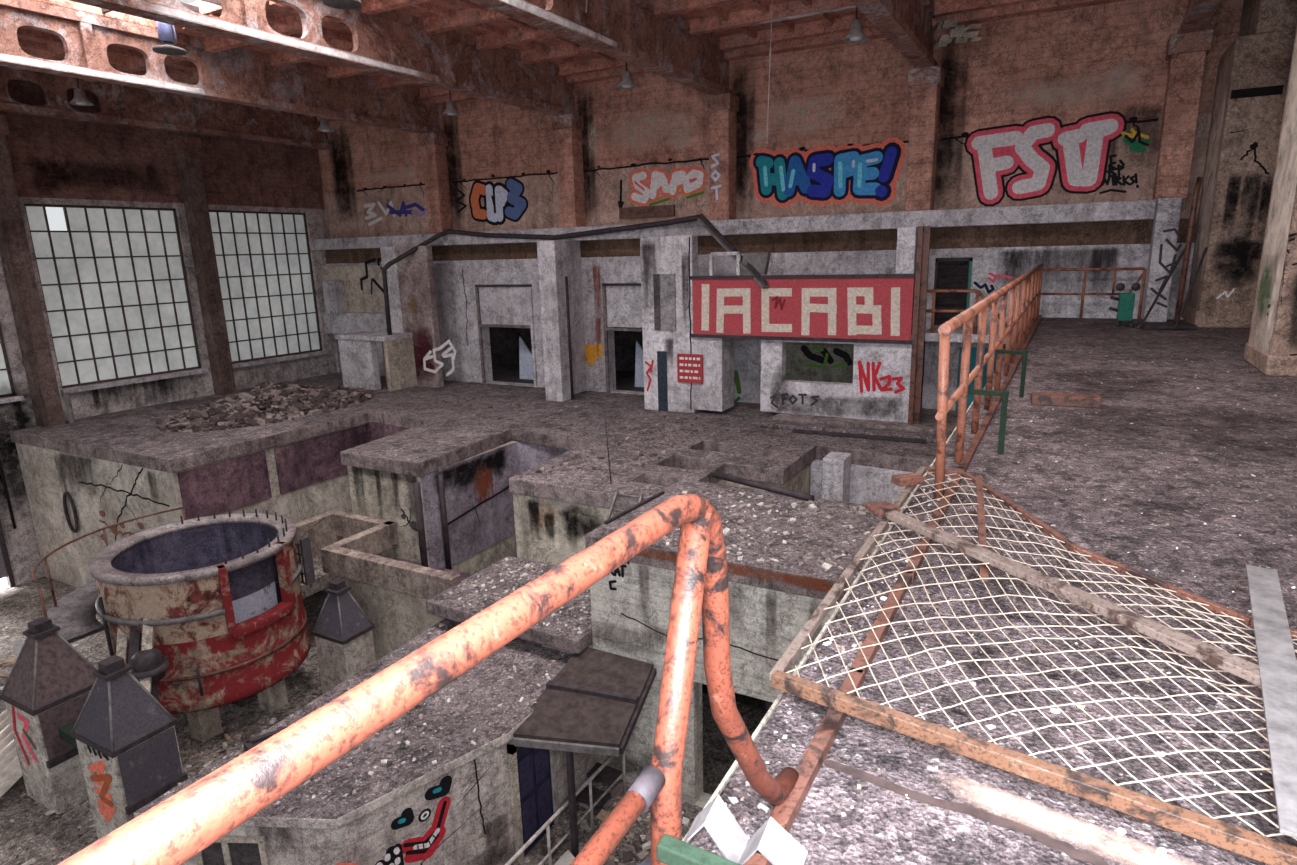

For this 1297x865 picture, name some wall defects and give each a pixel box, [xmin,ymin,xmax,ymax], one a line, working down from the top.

water stain [1217,176,1273,257]